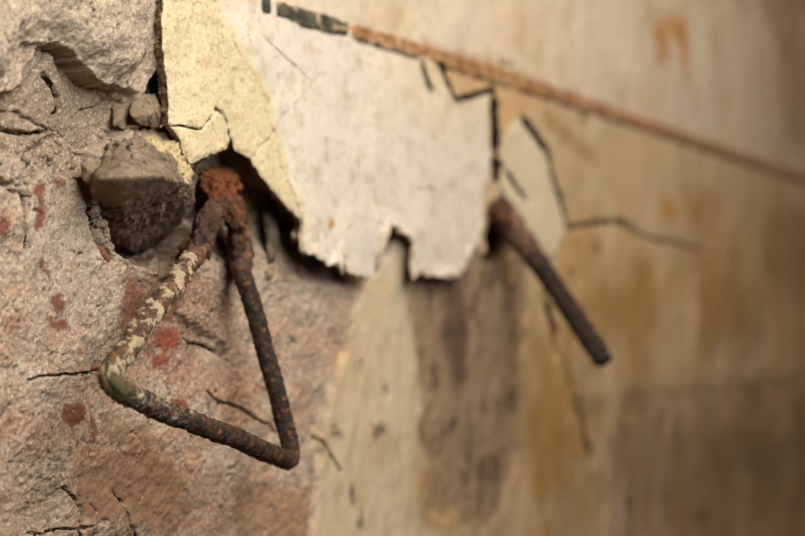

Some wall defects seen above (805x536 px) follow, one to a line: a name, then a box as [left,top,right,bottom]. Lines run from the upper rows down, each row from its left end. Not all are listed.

rust [192,165,255,266]
spalling [0,0,528,536]
crack [350,37,527,202]
rust [487,195,518,236]
flaking render [501,118,565,257]
crack [521,112,704,256]
crack [30,369,99,379]
crack [27,487,97,536]